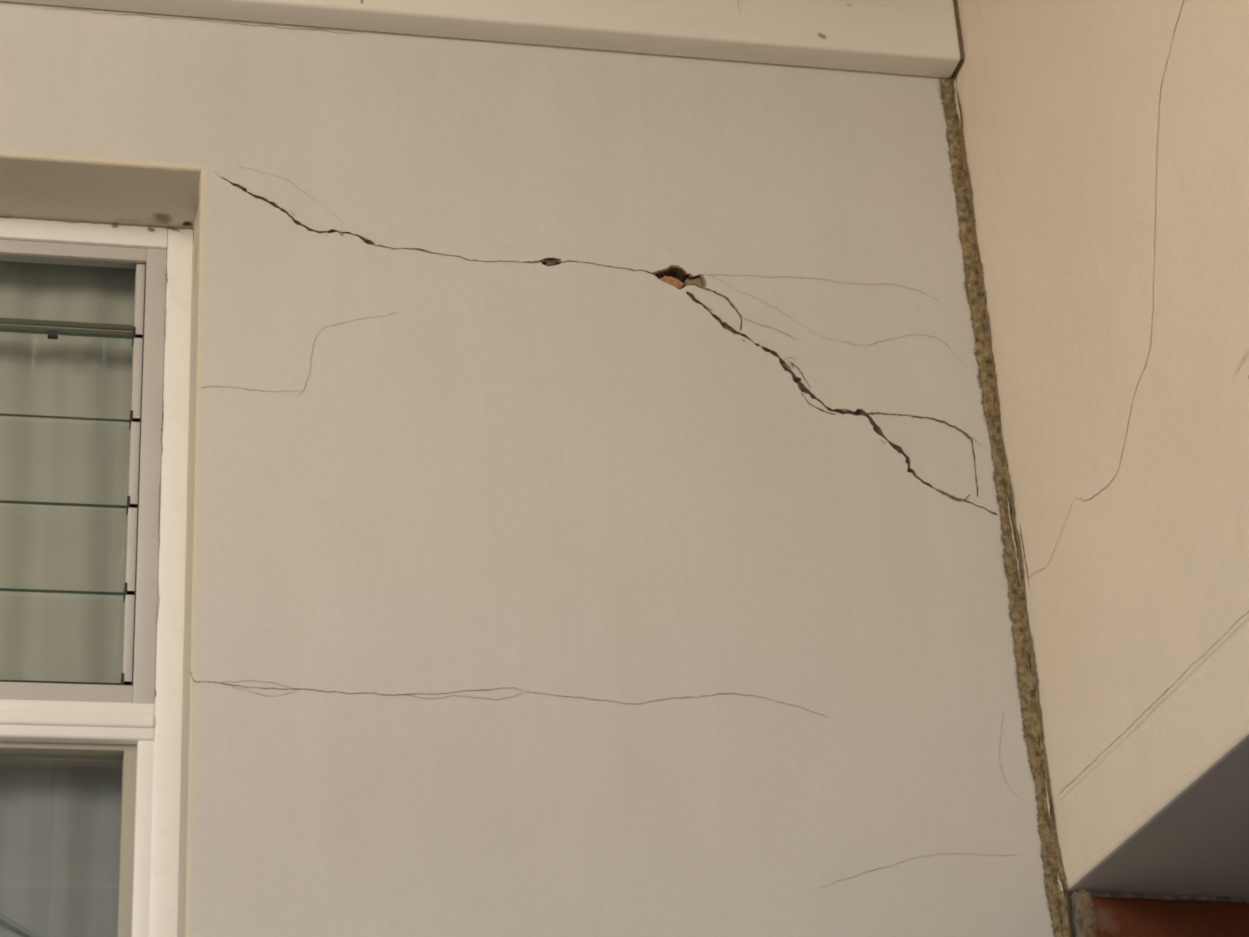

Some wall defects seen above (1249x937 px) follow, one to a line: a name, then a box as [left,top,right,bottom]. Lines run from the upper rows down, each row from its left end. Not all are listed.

crack [210,166,656,275]
spalling [652,265,707,289]
crack [684,274,998,515]
crack [191,675,828,717]